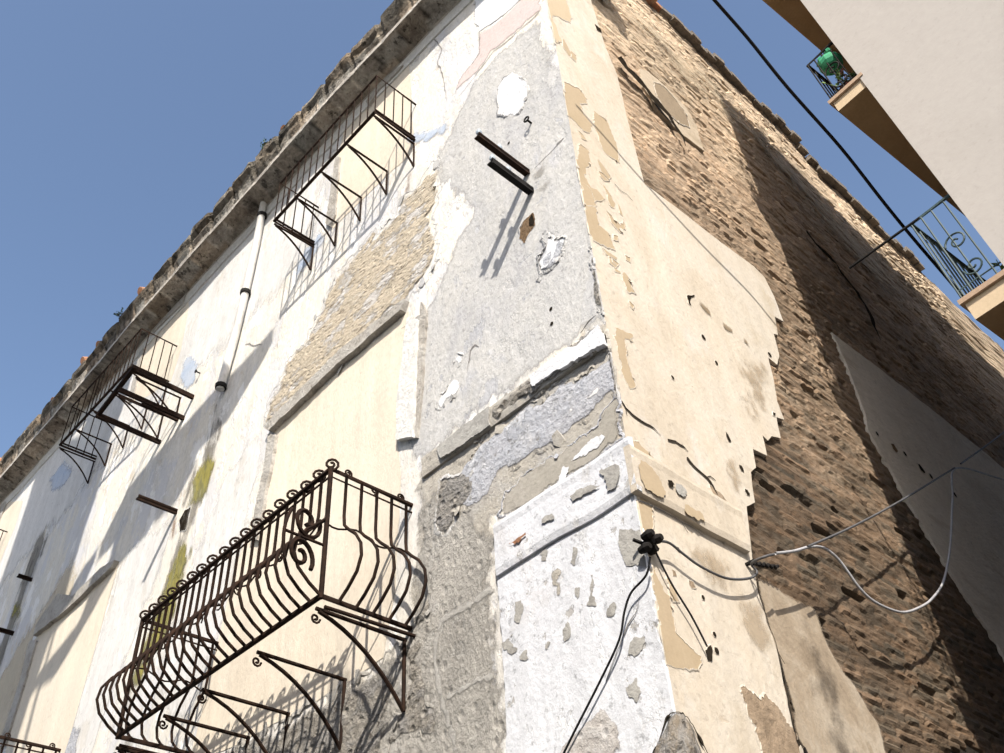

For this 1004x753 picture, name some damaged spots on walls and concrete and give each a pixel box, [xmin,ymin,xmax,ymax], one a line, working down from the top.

crack [618,56,686,146]
peeling [263,154,443,427]
crack [806,230,881,340]
peeling [434,81,719,673]
leakage [203,420,221,461]
crack [622,401,718,495]
leakage [157,467,200,604]
peeling [561,709,620,753]
peeling [626,677,641,702]
peeling [739,684,804,753]